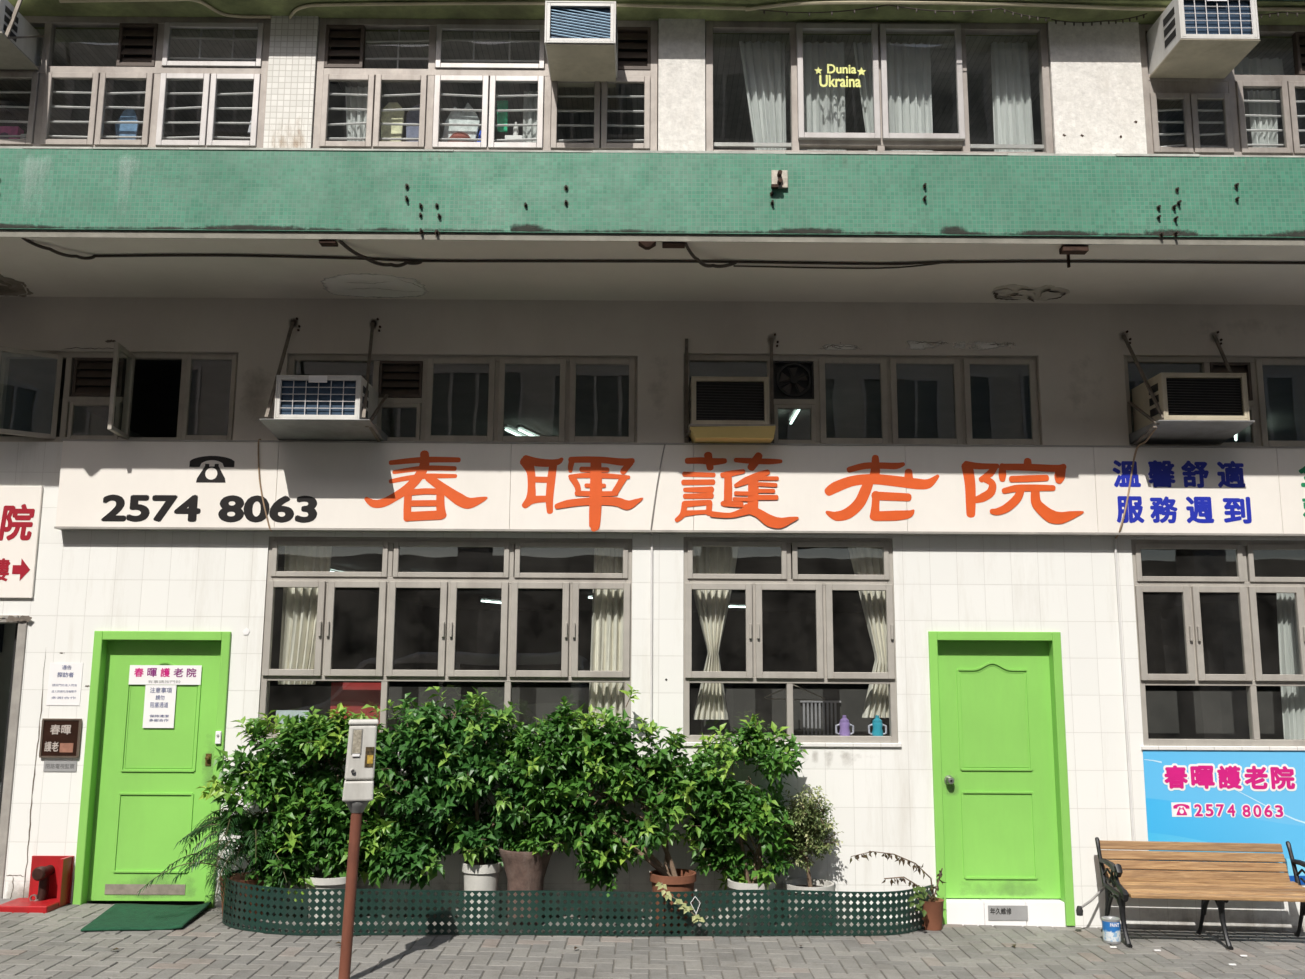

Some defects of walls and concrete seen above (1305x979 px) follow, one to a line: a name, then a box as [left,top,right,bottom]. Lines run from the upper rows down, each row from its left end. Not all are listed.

spalling [0,274,33,297]
peeling [992,284,1070,302]